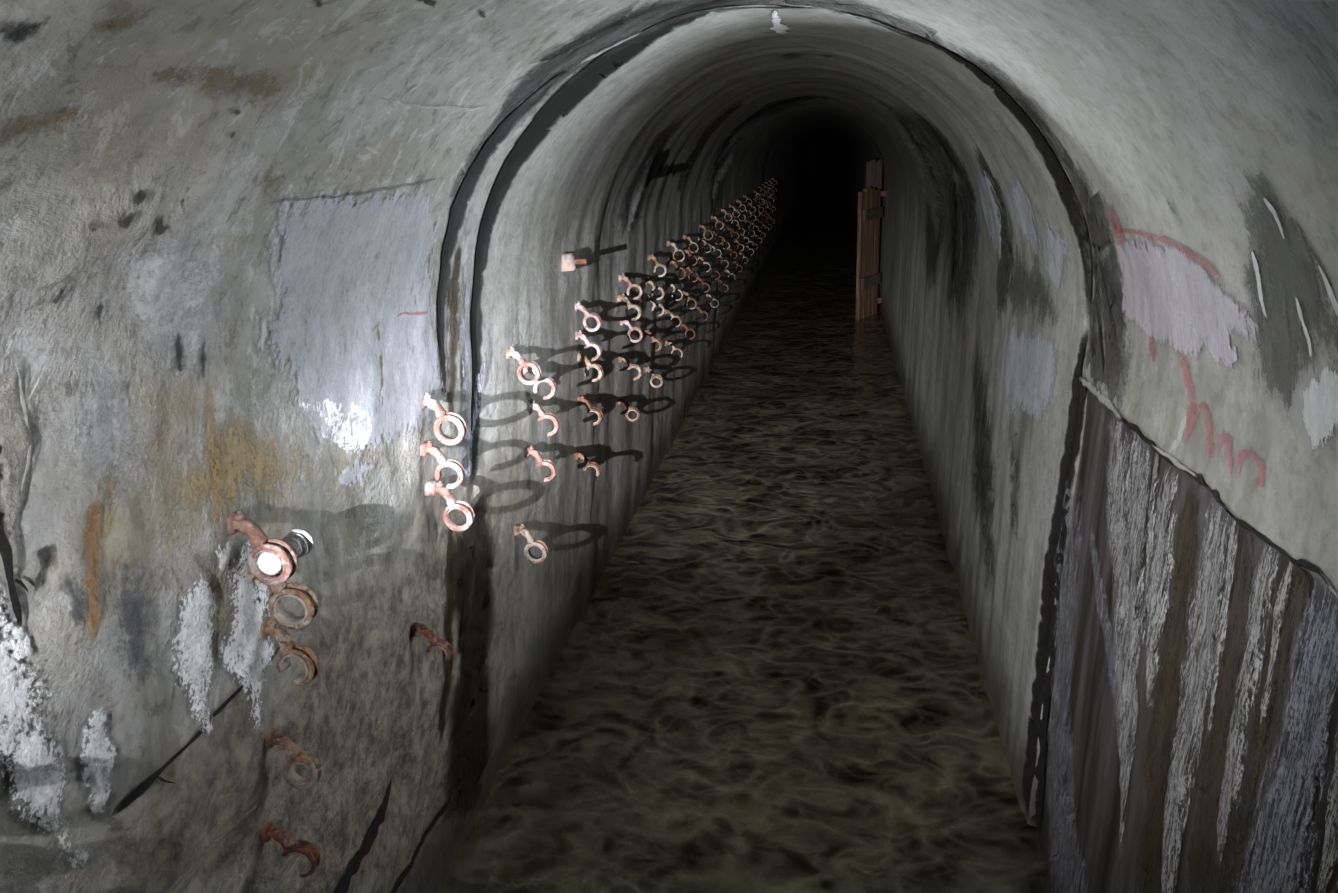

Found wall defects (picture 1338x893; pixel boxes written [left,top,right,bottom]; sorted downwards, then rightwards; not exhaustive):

water stain [0,19,48,44]
peeling [1116,165,1338,450]
crack [0,368,41,491]
corrosion [165,388,312,531]
crack [386,4,1338,833]
crack [0,522,28,627]
water stain [0,588,117,868]
water stain [60,578,89,624]
corrosion [83,479,116,645]
water stain [114,565,150,678]
corrosion [1135,478,1316,893]